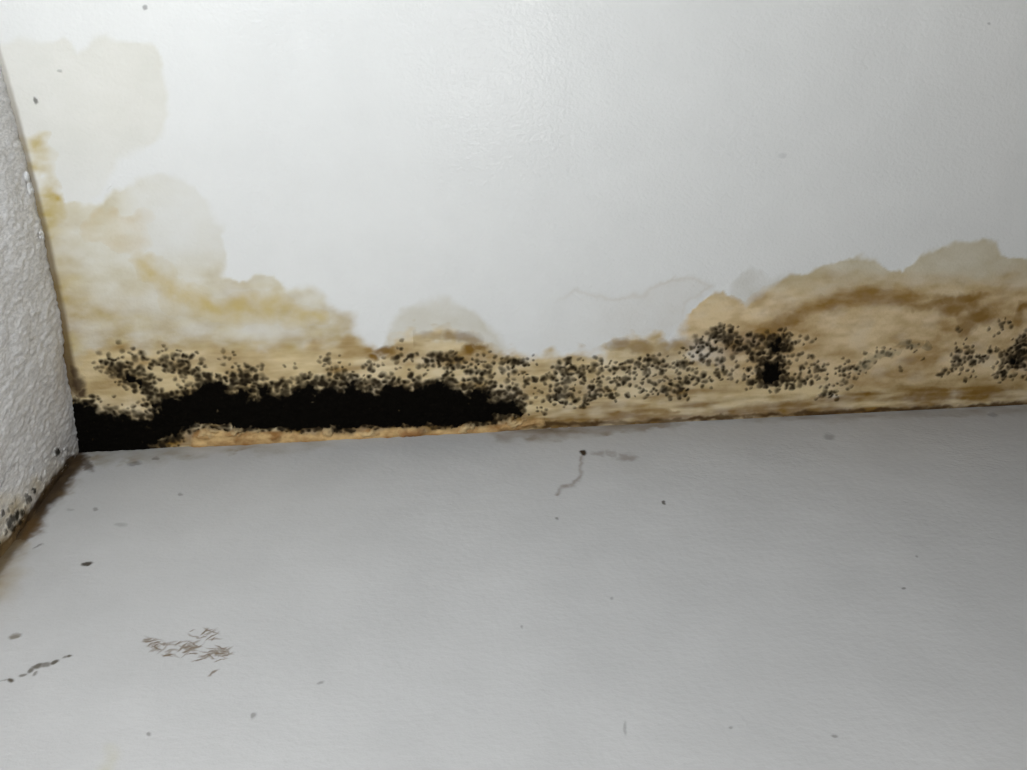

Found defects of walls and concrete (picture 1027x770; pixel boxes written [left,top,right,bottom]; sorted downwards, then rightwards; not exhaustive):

damp [0,29,1027,557]